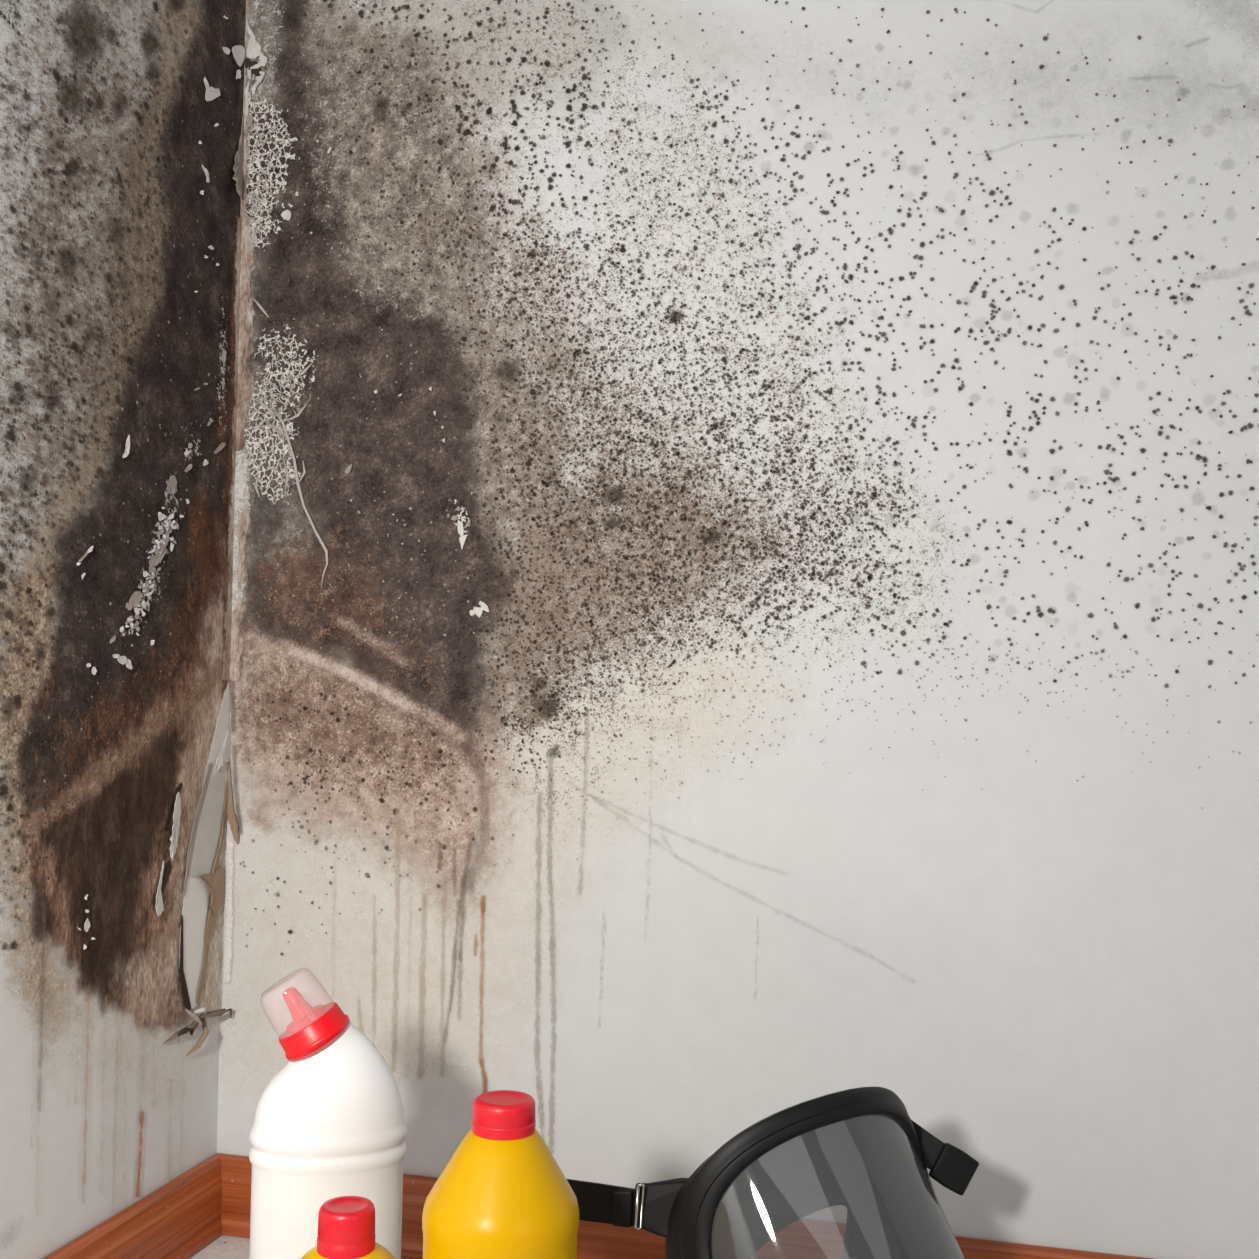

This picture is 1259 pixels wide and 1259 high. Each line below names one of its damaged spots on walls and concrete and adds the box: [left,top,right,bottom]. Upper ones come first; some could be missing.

leakage [1092,303,1177,351]
leakage [1129,226,1215,313]
leakage [1231,282,1256,326]
leakage [1074,340,1111,413]
peeling [110,0,267,1010]
leakage [0,0,1104,1060]
leakage [950,377,1259,544]
leakage [1107,441,1259,643]
leakage [1076,597,1140,691]